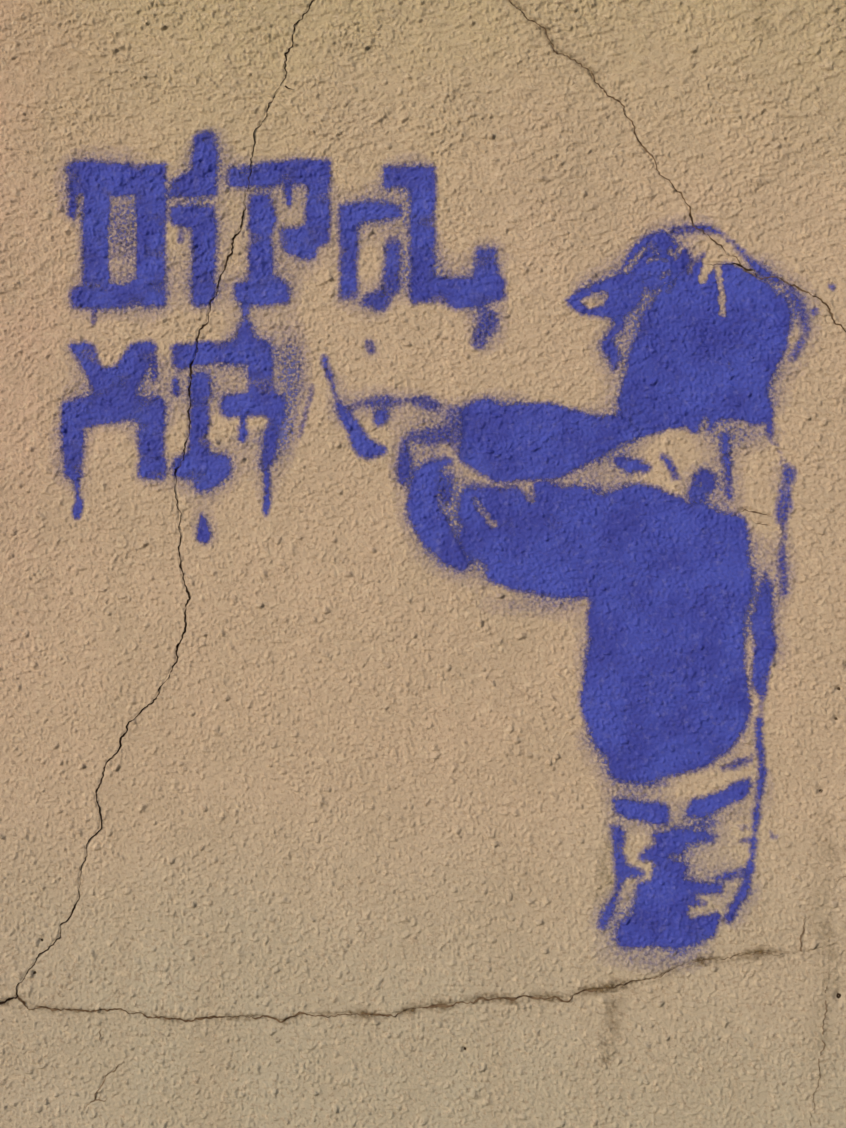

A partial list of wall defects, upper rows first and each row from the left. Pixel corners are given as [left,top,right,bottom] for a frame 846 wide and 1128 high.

crack [508,0,846,332]
crack [80,0,314,876]
crack [0,885,783,1023]
crack [800,916,830,1126]